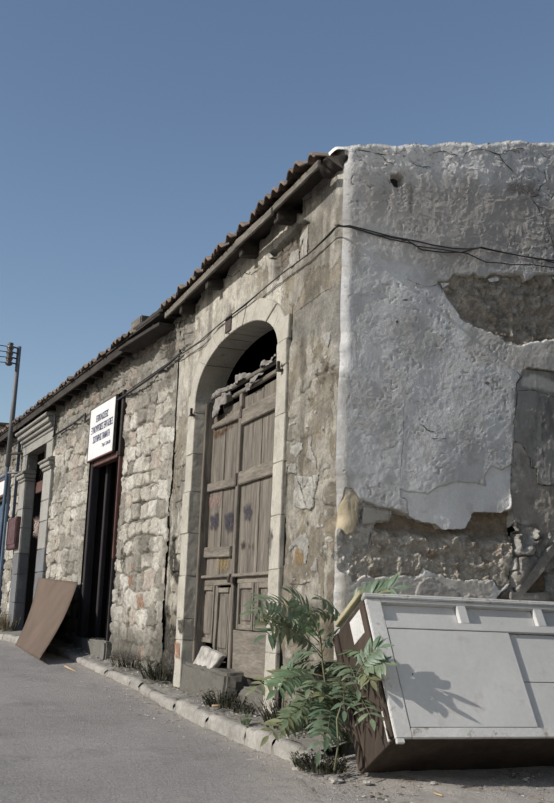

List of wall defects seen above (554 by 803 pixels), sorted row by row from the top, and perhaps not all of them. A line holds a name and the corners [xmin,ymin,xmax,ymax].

crack [343,148,523,177]
crack [530,170,554,247]
spalling [438,274,554,346]
crack [513,364,553,486]
spalling [331,442,554,602]